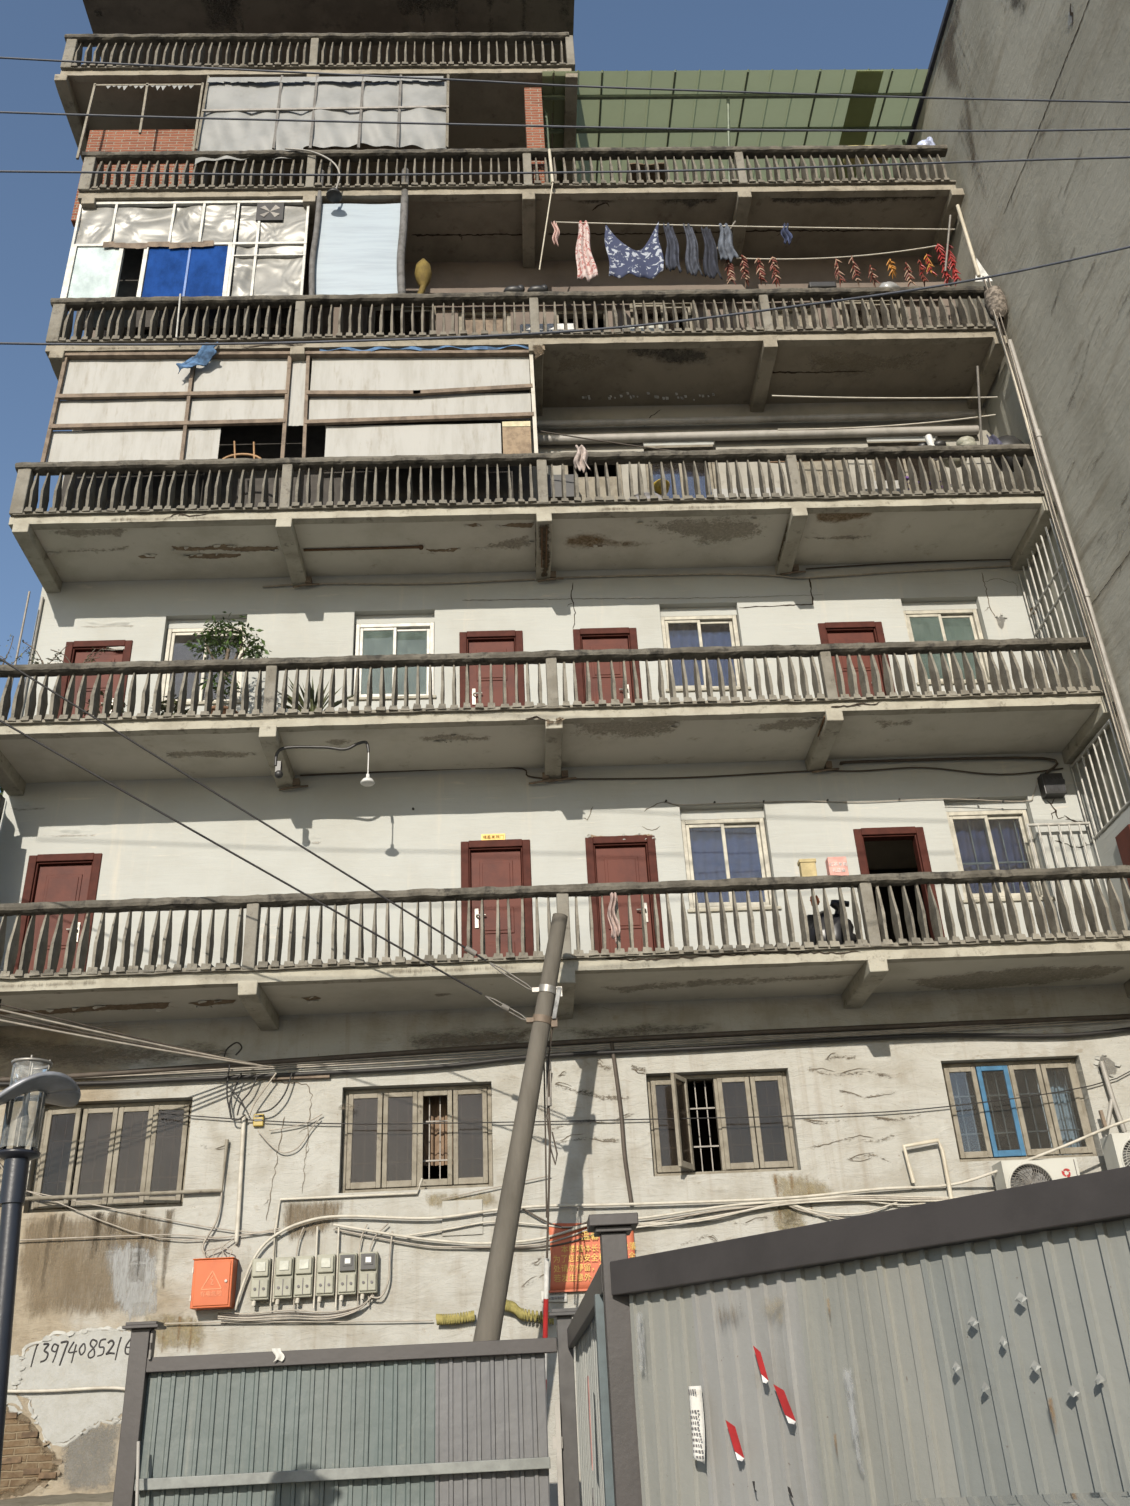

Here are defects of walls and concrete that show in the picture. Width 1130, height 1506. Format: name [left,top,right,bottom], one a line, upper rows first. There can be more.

crack [805,1053,919,1161]
water stain [22,1211,172,1315]